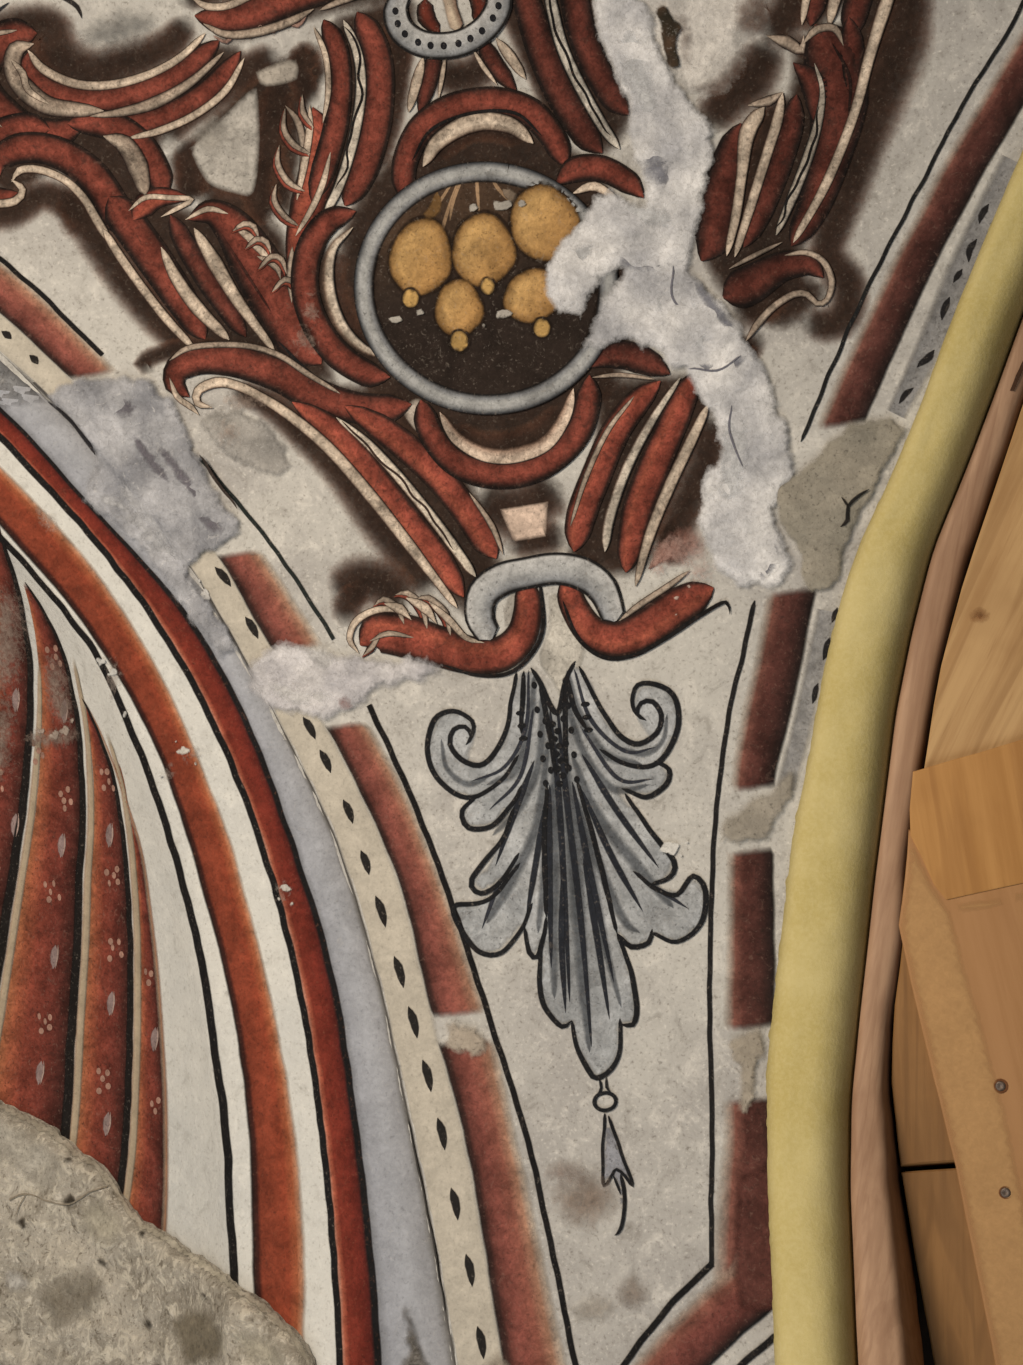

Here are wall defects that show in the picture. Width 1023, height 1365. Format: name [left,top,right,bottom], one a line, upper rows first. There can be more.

spalling [0,1100,316,1365]